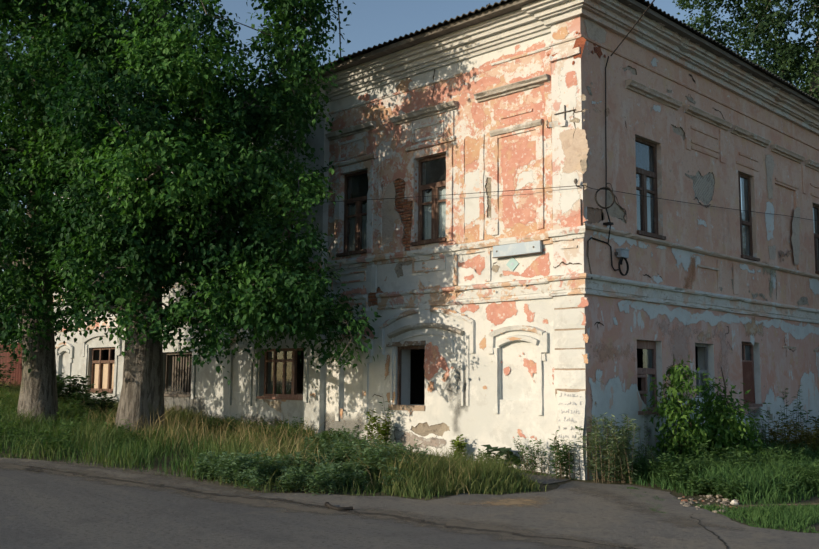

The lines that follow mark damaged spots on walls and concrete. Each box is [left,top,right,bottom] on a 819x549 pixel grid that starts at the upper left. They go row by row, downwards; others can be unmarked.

peeling [356,26,606,171]
flaking render [559,82,609,190]
flaking render [393,173,418,251]
peeling [341,248,550,350]
peeling [423,342,453,393]
peeling [519,353,537,376]
flaking render [394,429,446,448]